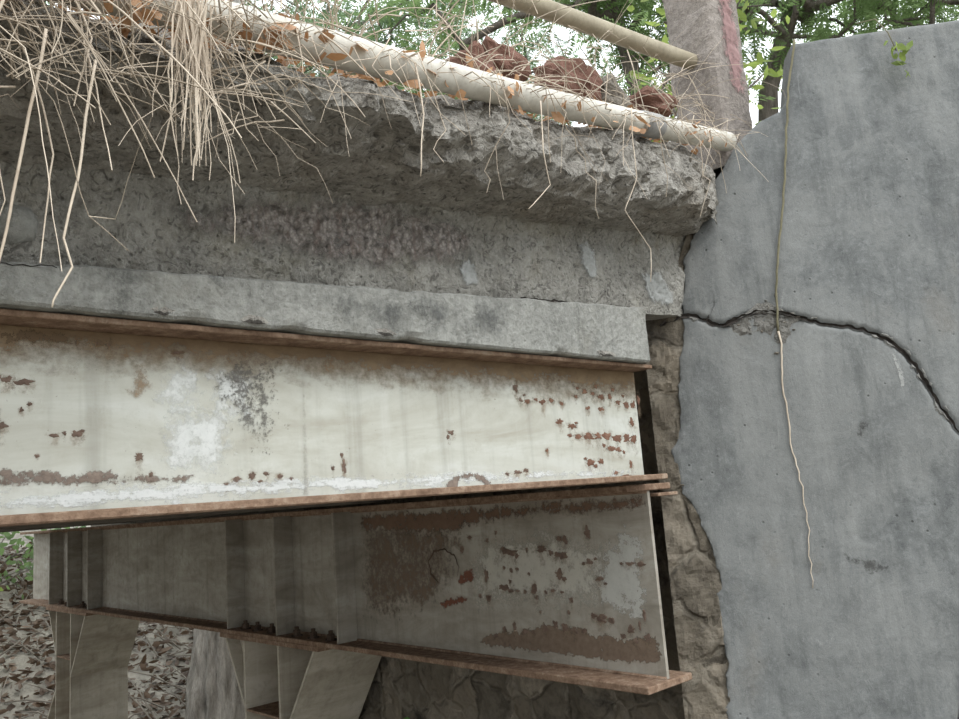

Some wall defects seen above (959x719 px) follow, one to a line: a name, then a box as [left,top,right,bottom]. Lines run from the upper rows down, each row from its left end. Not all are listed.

corrosion [0,325,640,476]
crack [659,294,959,433]
corrosion [0,468,194,486]
corrosion [224,472,294,486]
corrosion [361,496,646,614]
corrosion [478,535,662,664]